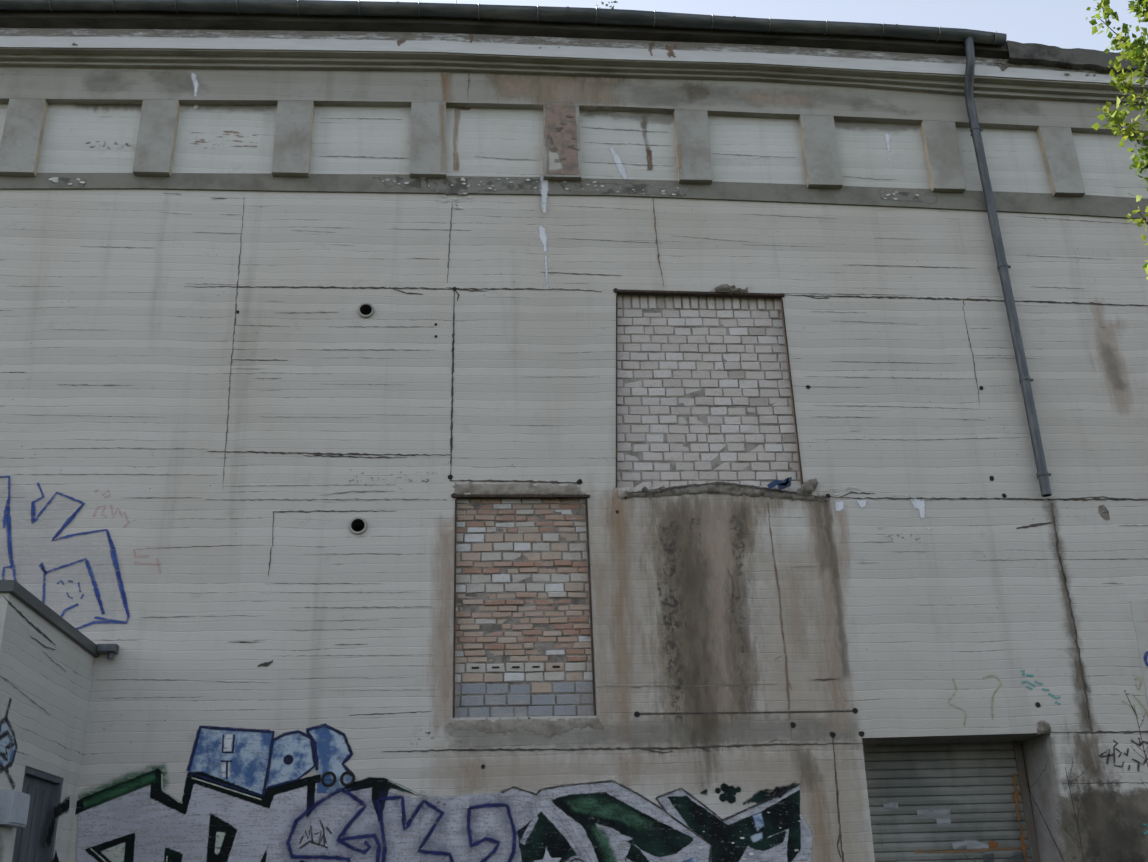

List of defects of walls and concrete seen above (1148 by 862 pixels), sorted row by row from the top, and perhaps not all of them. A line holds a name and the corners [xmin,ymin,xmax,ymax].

rust [441,97,470,170]
spalling [374,105,579,195]
leakage [538,175,548,288]
crack [864,238,962,268]
crack [783,287,1148,440]
crack [1,197,621,716]
leakage [649,493,780,742]
crack [384,481,1148,862]